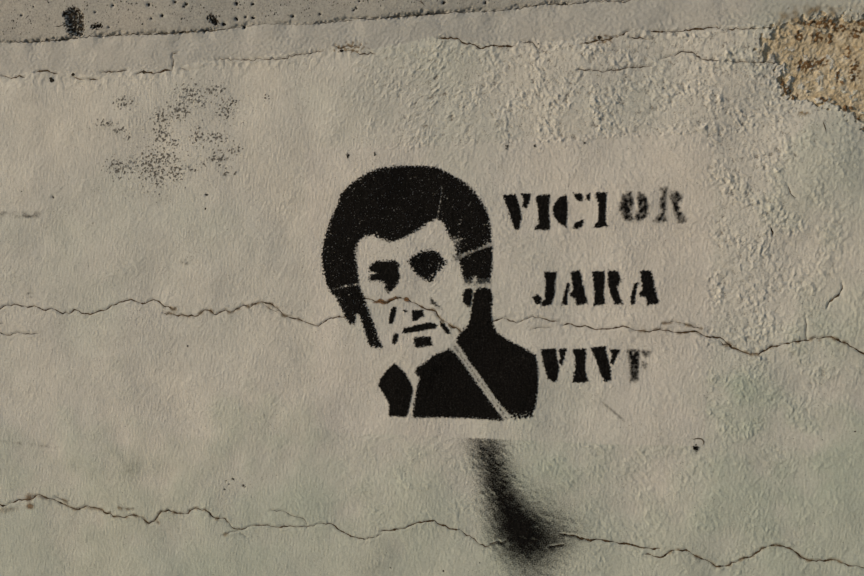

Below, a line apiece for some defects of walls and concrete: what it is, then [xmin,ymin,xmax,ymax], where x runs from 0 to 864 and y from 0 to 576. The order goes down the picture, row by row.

crack [4,0,630,83]
crack [579,27,778,72]
peeling [753,8,864,132]
crack [0,299,346,327]
crack [365,296,462,332]
crack [493,316,864,355]
crack [0,494,503,547]
crack [554,533,864,568]